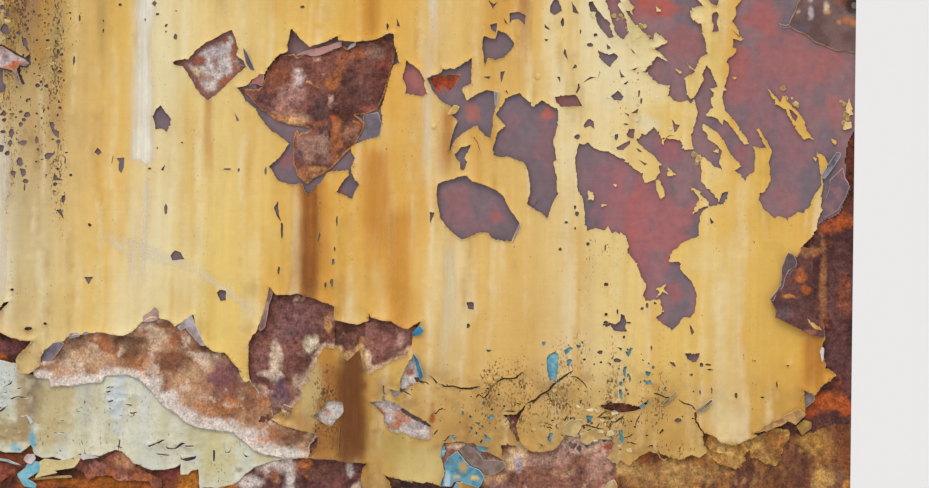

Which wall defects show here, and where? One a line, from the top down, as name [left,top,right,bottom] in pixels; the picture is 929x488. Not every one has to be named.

peeling [0,4,55,98]
peeling [0,99,68,218]
peeling [170,0,856,335]
rust [0,188,425,488]
peeling [311,397,344,431]
peeling [365,351,536,458]
peeling [542,341,583,396]
peeling [568,309,666,453]
rust [382,131,855,488]
peeling [670,349,712,376]